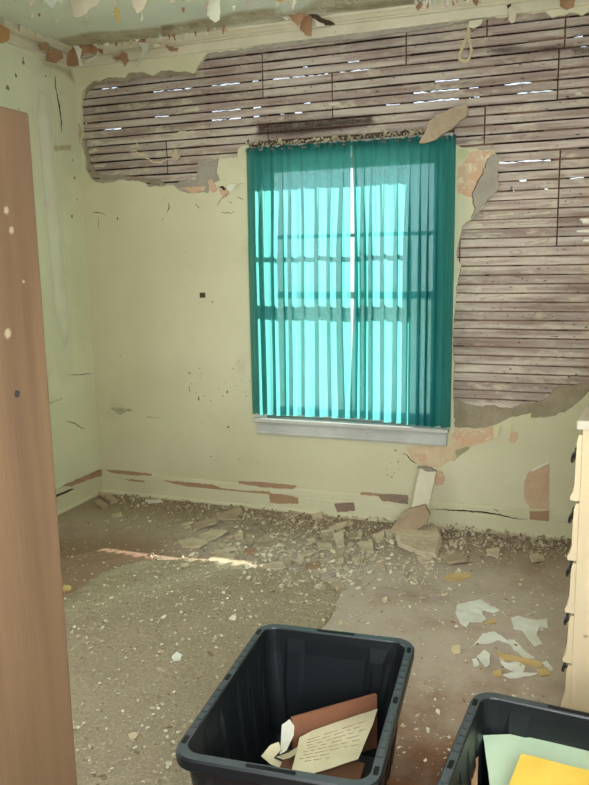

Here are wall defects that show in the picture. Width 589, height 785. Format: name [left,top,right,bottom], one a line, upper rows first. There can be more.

crack [54,77,62,132]
flaking render [0,0,589,486]
peeling [164,480,299,504]
crack [433,508,527,520]
peeling [523,462,550,521]